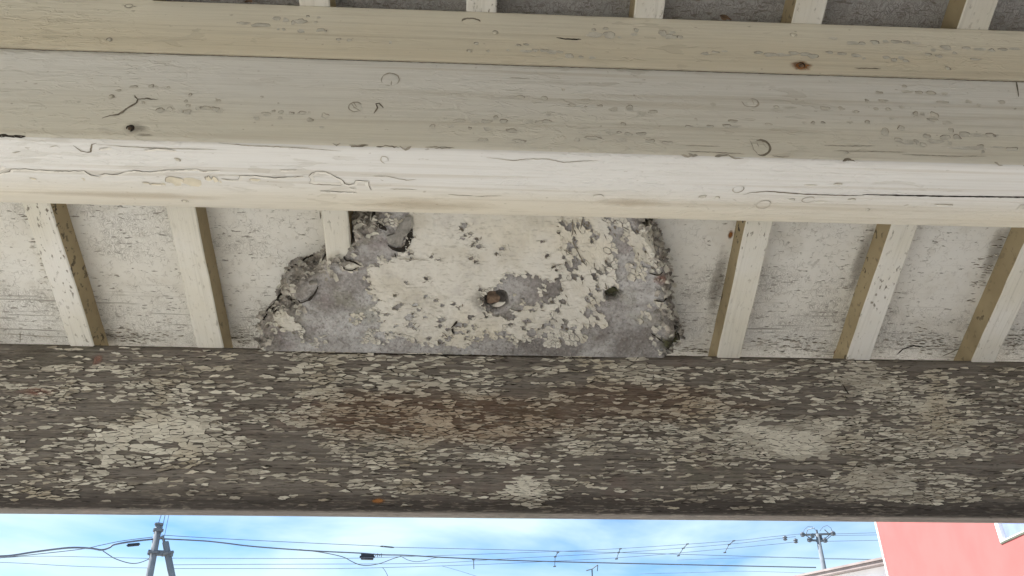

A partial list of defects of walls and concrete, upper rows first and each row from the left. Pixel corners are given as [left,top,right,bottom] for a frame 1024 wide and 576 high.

crack [0,48,1023,113]
crack [103,96,156,118]
crack [0,134,333,153]
crack [493,156,581,164]
crack [687,139,771,156]
crack [825,145,973,157]
crack [375,156,416,190]
crack [732,186,1024,209]
peeling [0,212,1024,511]